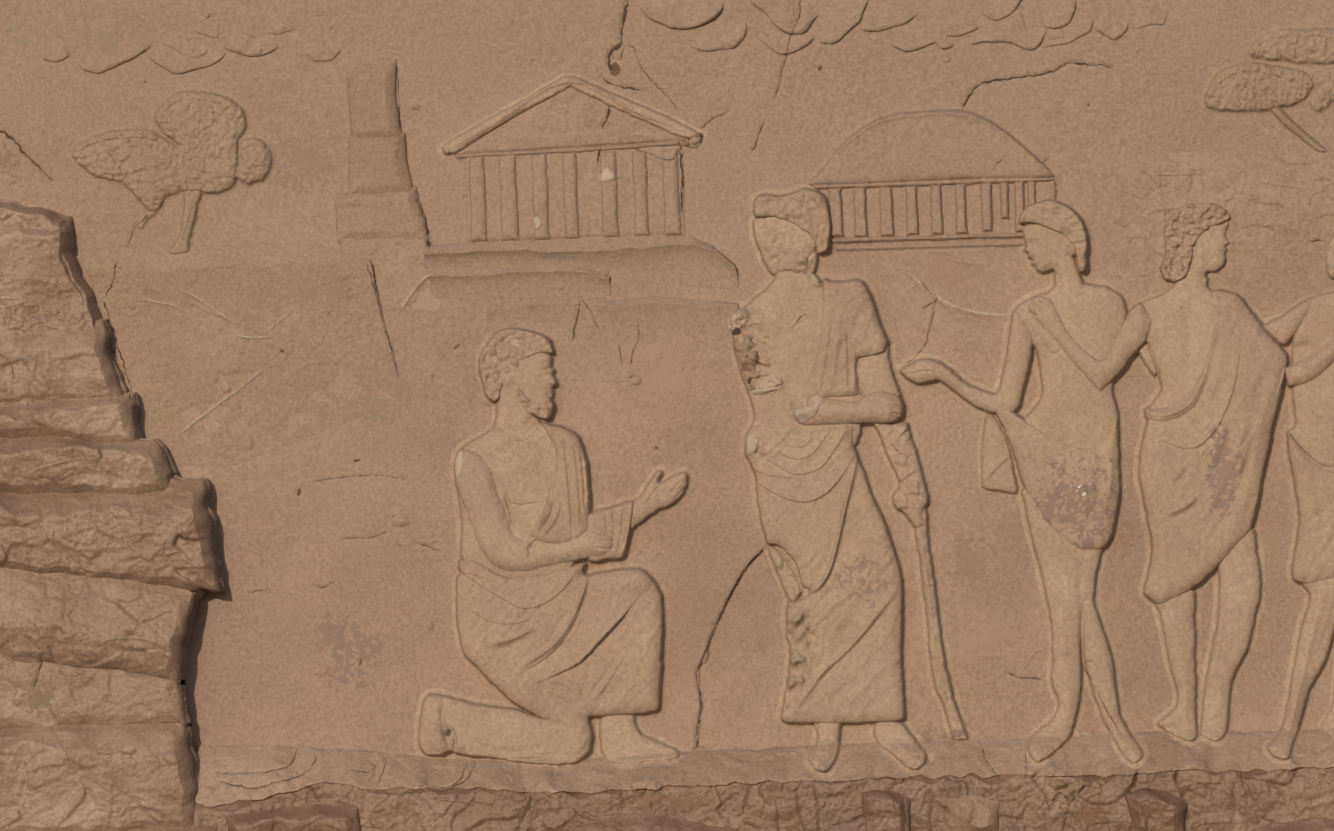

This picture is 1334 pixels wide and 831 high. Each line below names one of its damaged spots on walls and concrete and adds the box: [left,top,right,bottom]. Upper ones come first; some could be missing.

crack [597,0,729,211]
crack [695,548,766,748]